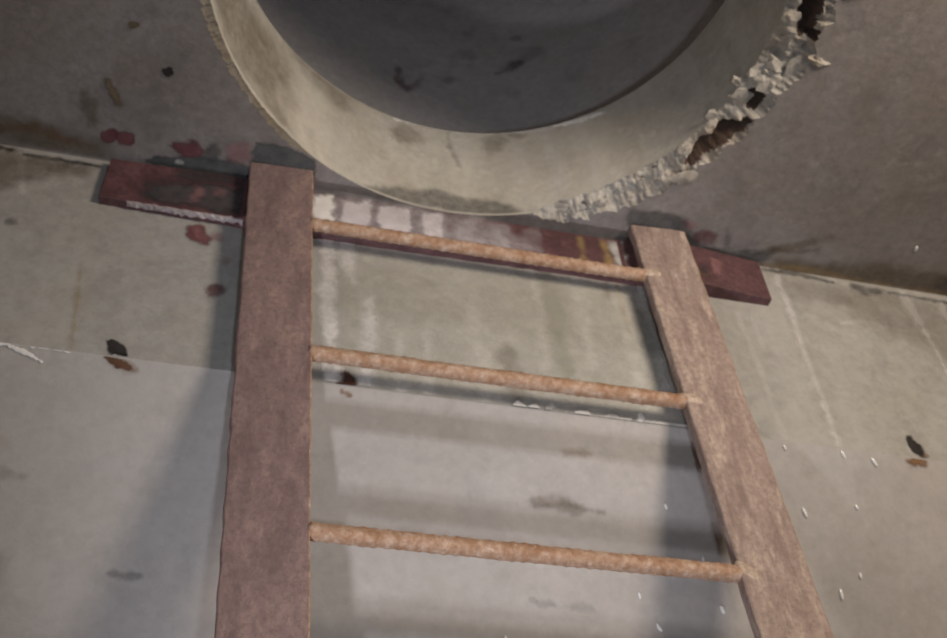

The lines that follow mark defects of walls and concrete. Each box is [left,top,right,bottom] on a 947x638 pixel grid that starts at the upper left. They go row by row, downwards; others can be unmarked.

spalling [533,0,837,223]
corrosion [104,356,132,371]